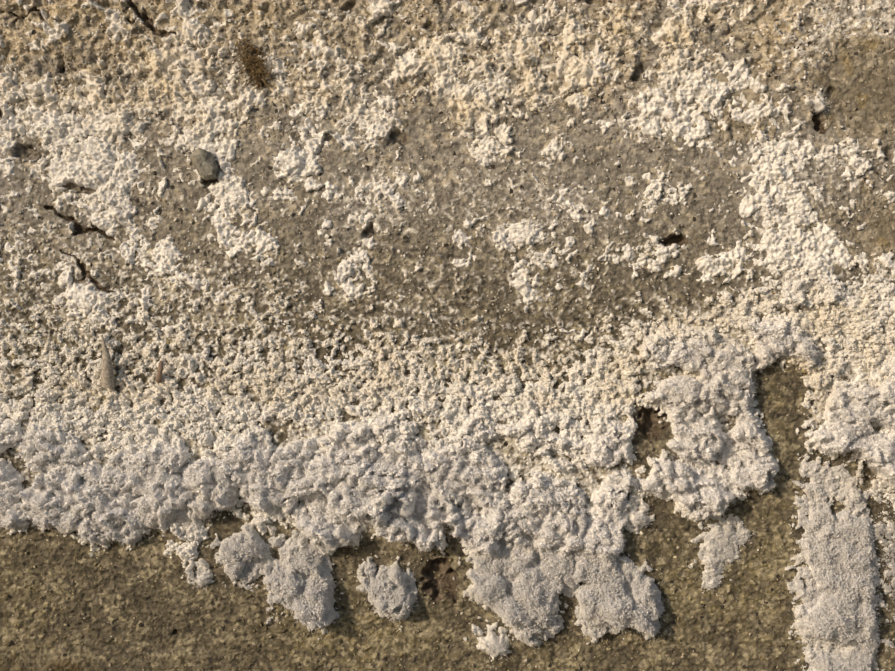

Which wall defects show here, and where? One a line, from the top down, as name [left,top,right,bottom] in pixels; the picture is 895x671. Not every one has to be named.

crack [44,205,116,293]
leakage [0,261,895,622]